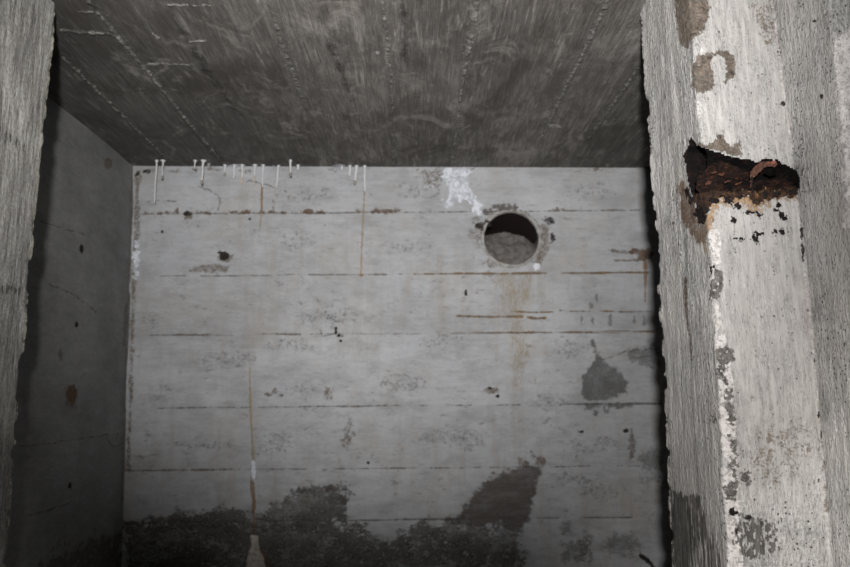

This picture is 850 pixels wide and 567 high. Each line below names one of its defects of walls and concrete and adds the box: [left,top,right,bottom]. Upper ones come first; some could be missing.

spalling [674,0,736,128]
peeling [772,1,792,151]
corrosion [229,184,286,226]
corrosion [356,192,400,276]
water stain [417,168,484,216]
corrosion [672,181,795,251]
water stain [582,355,630,416]
spalling [683,134,800,567]
peeling [802,273,822,439]
corrosion [244,440,271,567]
water stain [38,451,546,567]